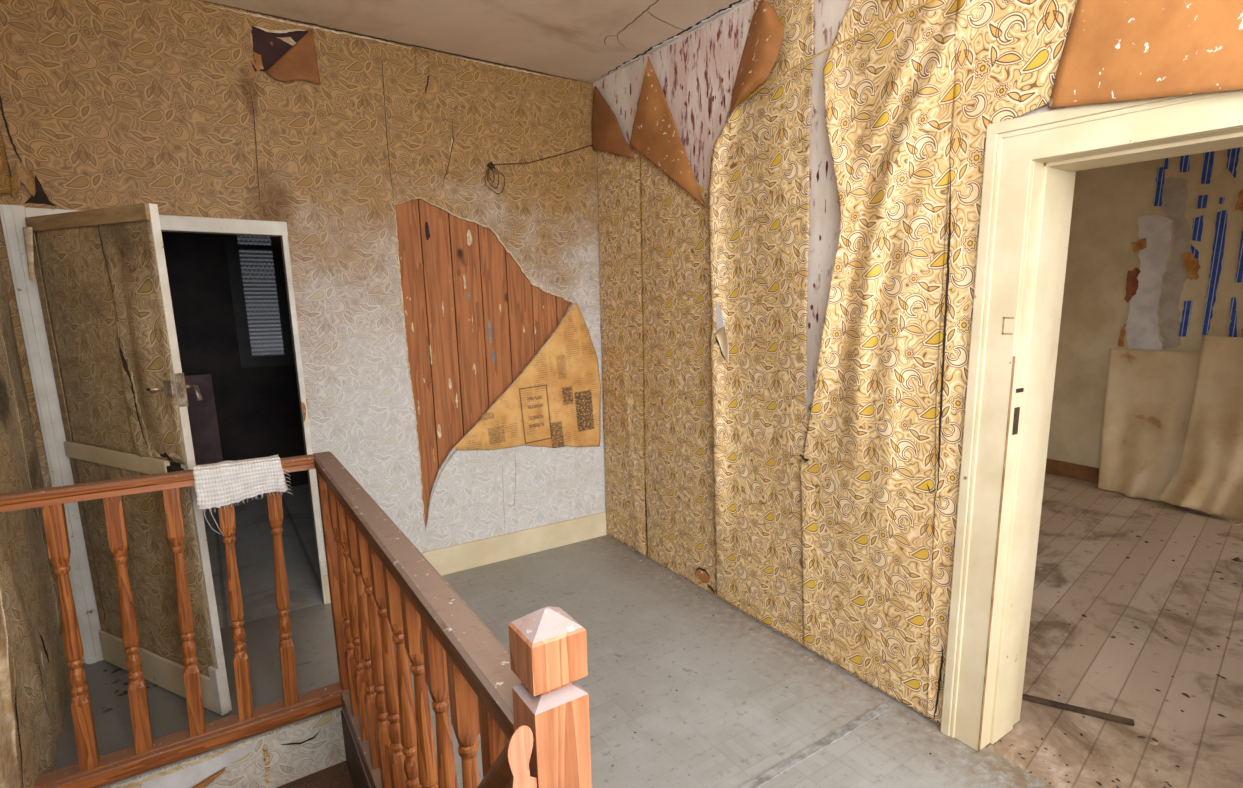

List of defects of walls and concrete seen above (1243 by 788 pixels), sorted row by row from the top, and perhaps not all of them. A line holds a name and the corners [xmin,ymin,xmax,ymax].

crack [604,0,683,46]
flaking render [592,0,784,206]
peeling [1048,0,1243,108]
flaking render [806,0,850,422]
peeling [715,298,729,364]
flaking render [1125,214,1173,350]
flaking render [141,743,257,788]